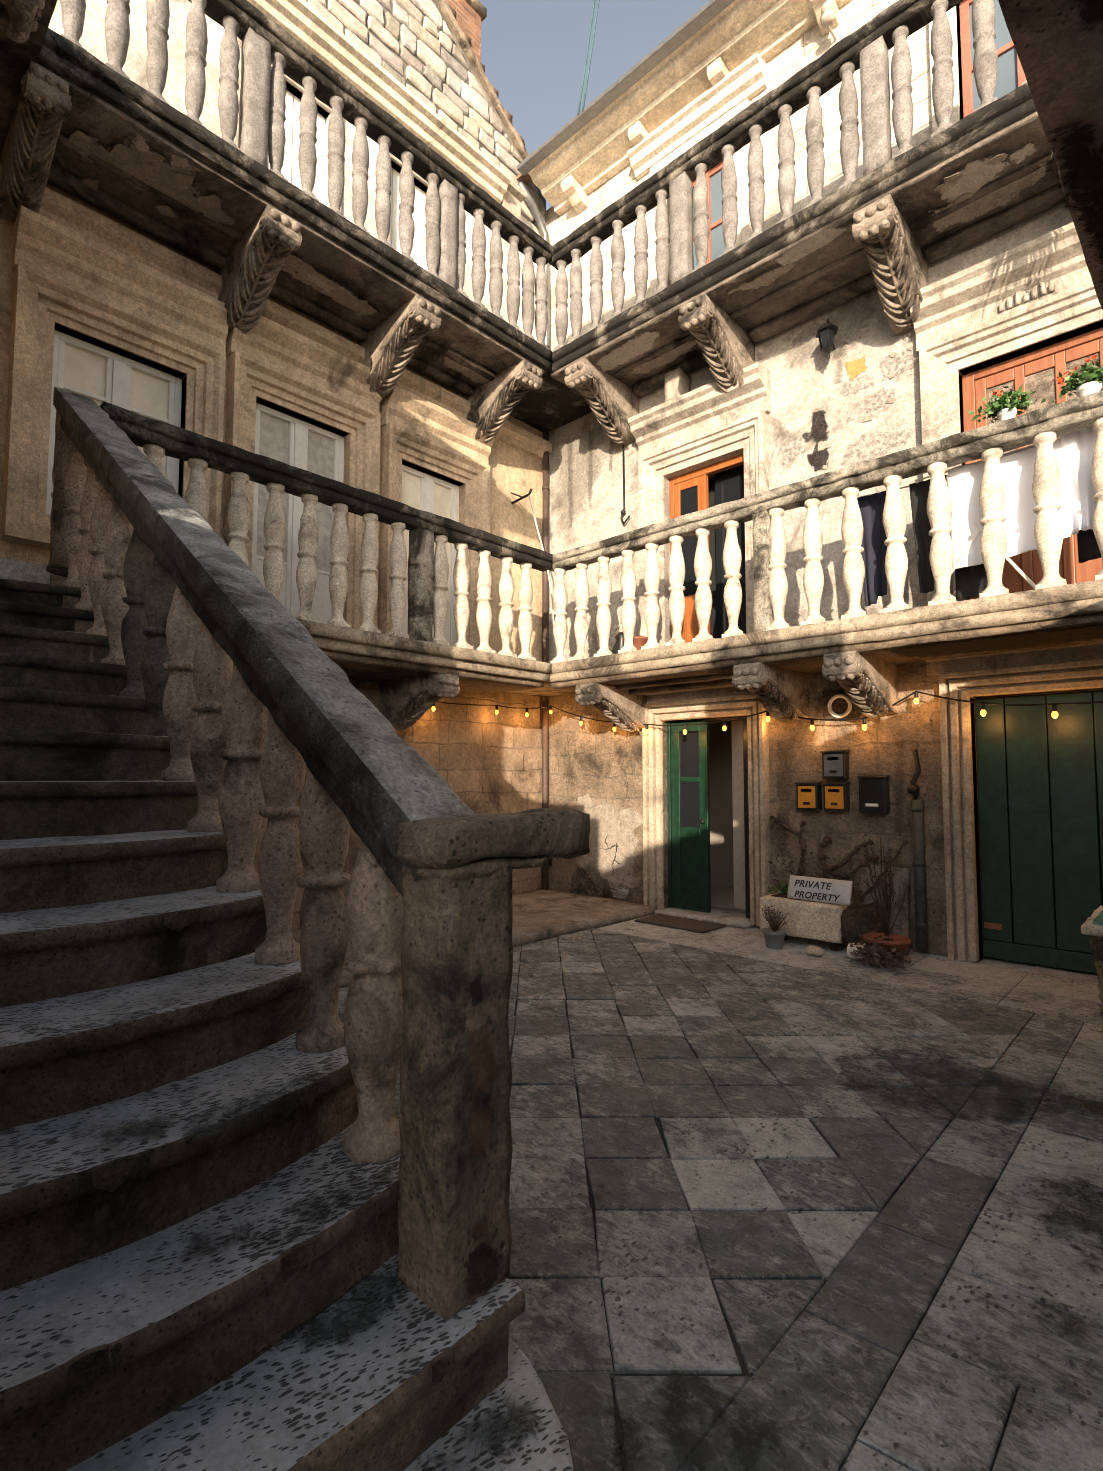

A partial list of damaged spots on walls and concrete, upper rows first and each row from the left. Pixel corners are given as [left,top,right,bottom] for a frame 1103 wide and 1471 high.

flaking render [68,130,240,227]
damp [1049,120,1103,282]